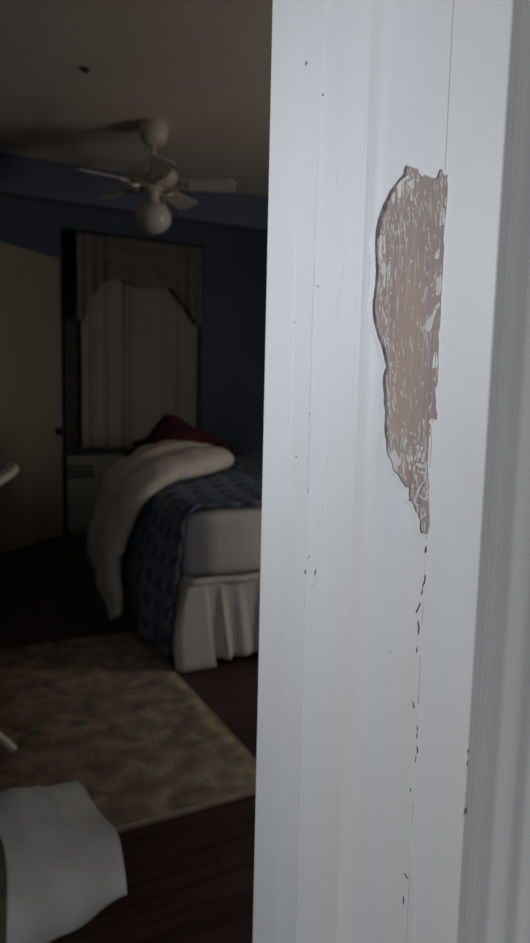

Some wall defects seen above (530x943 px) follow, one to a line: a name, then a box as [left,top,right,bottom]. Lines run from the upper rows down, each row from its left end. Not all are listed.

peeling [367,163,451,537]
crack [403,537,430,943]